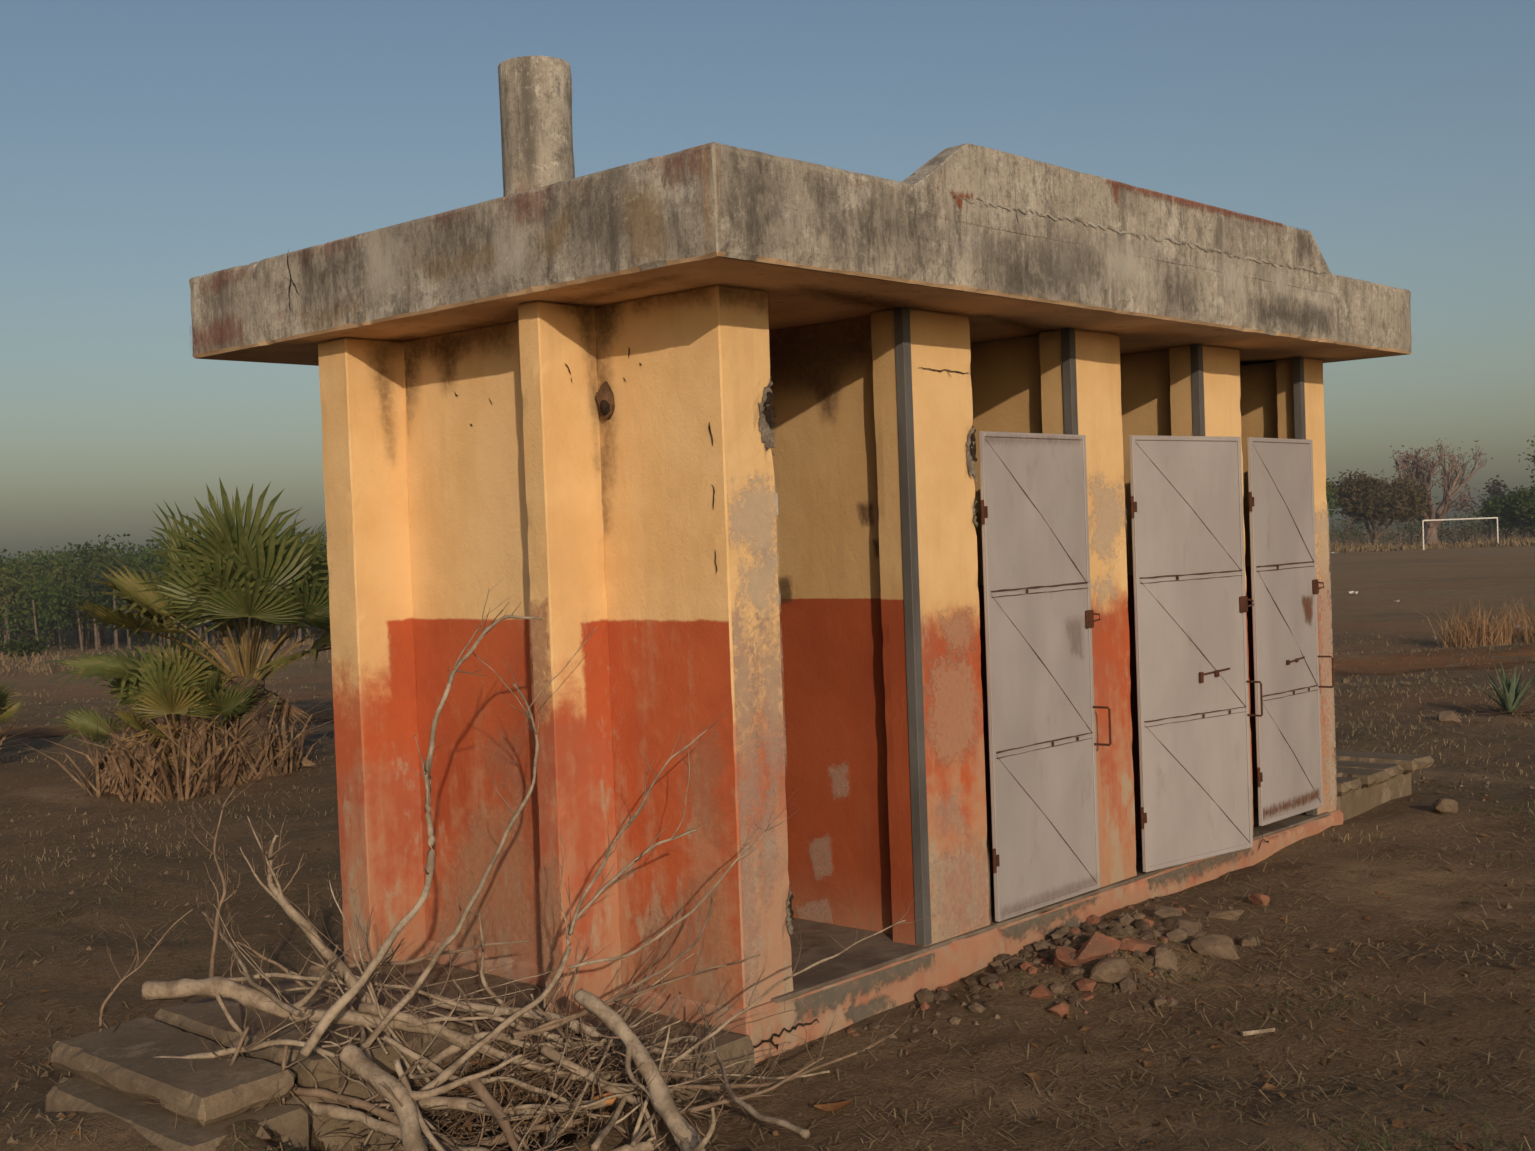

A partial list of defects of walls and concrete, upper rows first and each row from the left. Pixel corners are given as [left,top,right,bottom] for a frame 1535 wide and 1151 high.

spalling [758,377,776,456]
peeling [778,579,791,603]
peeling [732,611,786,957]
spalling [785,888,794,937]
crack [753,1019,819,1051]